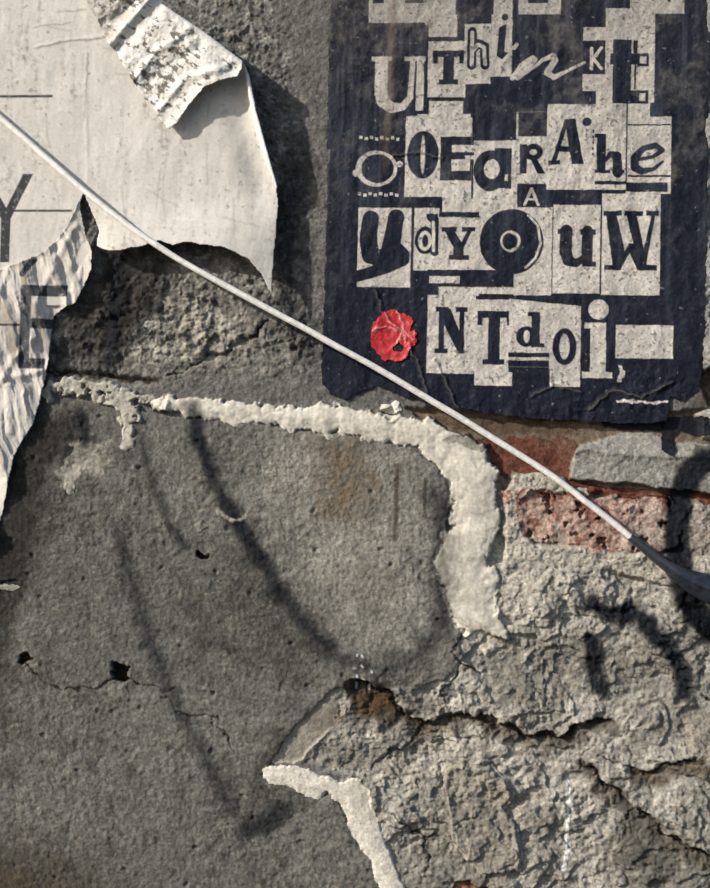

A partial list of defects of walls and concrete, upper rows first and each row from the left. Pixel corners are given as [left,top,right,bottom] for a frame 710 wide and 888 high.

peeling [391,400,402,414]
spalling [464,433,669,554]
spalling [691,491,710,505]
crack [24,661,167,699]
crack [183,714,230,744]
crack [347,680,428,753]
crack [449,712,615,740]
spalling [262,681,618,888]
crack [579,757,710,857]